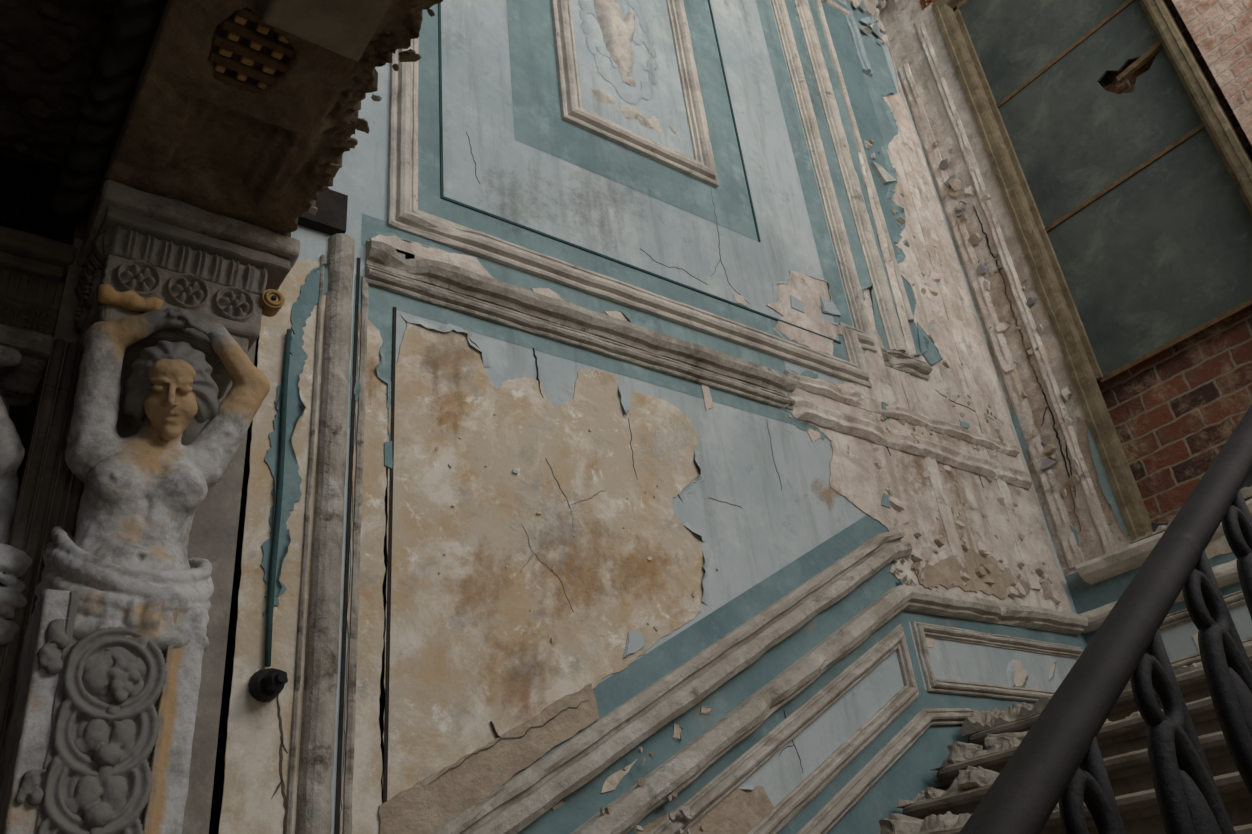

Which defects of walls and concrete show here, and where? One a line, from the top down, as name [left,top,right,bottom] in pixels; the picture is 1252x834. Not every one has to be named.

peeling [392,49,422,71]
peeling [320,163,340,192]
peeling [340,118,370,148]
peeling [780,0,1130,612]
crack [973,205,1081,531]
crack [546,459,599,531]
peeling [218,259,331,834]
peeling [339,314,719,834]
crack [520,523,574,612]